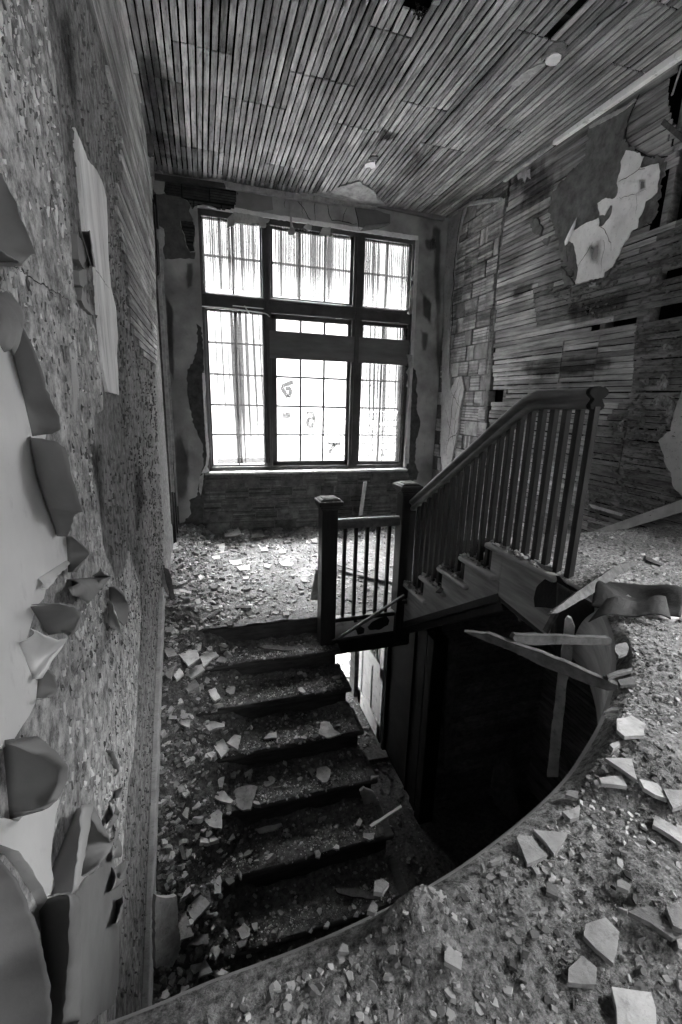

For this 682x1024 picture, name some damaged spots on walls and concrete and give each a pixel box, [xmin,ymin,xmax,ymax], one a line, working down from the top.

spalling [156,182,273,259]
crack [284,202,359,228]
spalling [529,95,667,287]
spalling [0,0,194,1024]
flaking render [184,324,420,558]